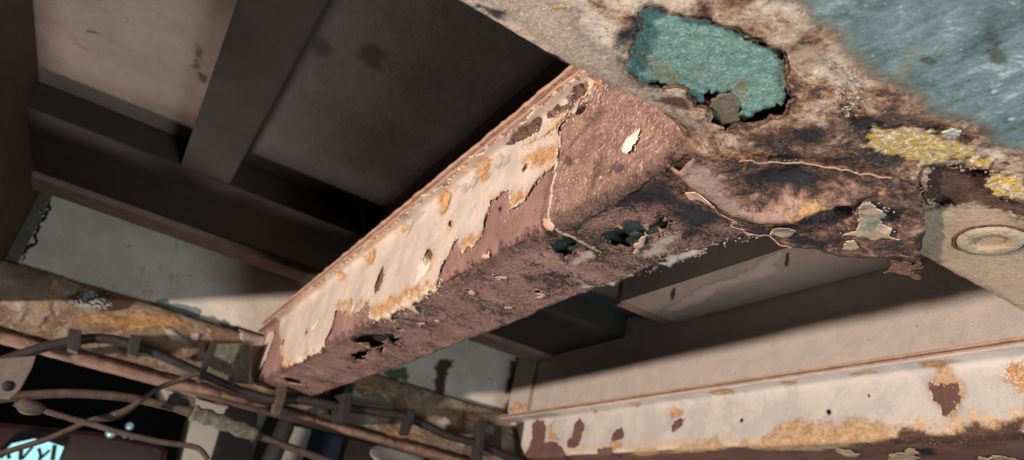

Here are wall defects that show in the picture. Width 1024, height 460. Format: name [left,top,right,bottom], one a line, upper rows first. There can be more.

corrosion [505,79,602,145]
corrosion [652,96,689,109]
crack [21,200,52,261]
peeling [252,70,612,381]
peeling [633,214,672,254]
corrosion [745,168,851,247]
peeling [840,201,901,251]
corrosion [67,291,190,332]
corrosion [434,359,453,394]
peeling [928,381,963,419]
peeling [524,417,584,460]
peeling [888,448,921,460]